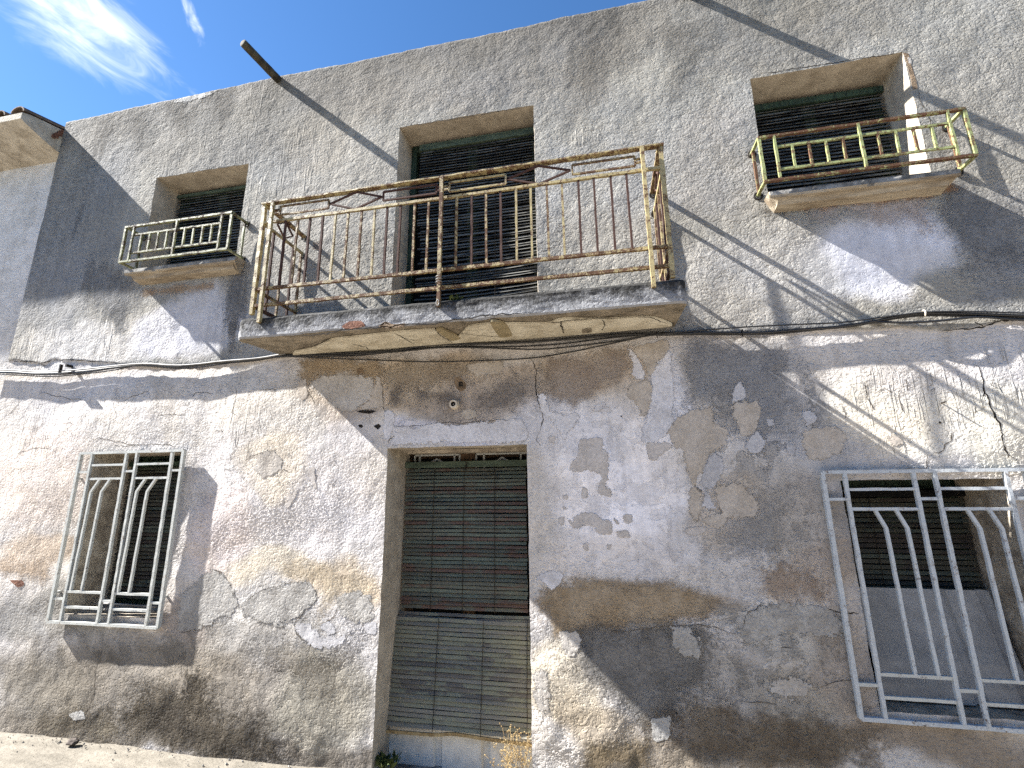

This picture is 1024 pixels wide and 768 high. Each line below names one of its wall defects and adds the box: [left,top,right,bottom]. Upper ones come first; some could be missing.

water stain [298,357,383,386]
water stain [549,350,631,405]
peeling [626,339,774,528]
peeling [802,410,846,461]
crack [974,364,1020,465]
peeling [294,621,346,650]
peeling [364,622,377,635]
water stain [537,577,884,768]